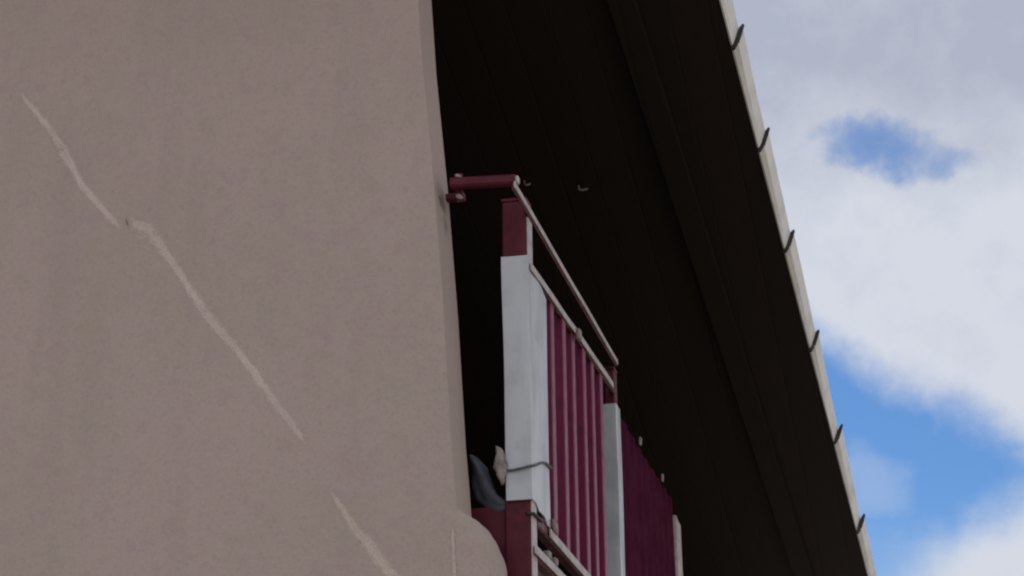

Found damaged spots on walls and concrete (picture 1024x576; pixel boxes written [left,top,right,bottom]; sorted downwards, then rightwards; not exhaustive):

crack [21,92,304,441]
crack [332,494,400,576]